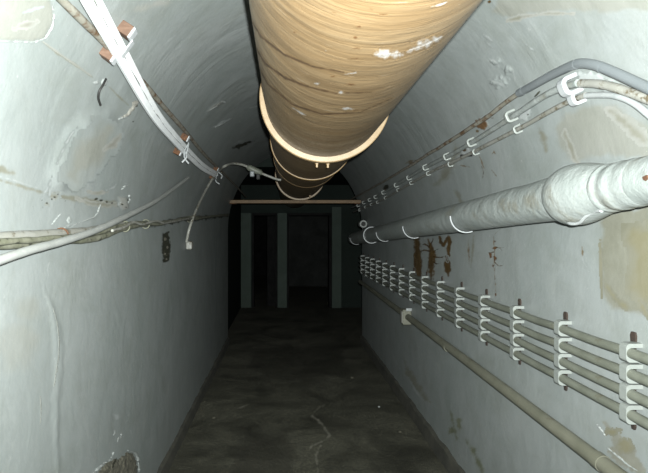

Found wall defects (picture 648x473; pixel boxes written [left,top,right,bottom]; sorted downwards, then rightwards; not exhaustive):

peeling [0,0,57,45]
spalling [162,231,171,262]
rust [412,234,453,283]
damp [596,206,648,321]
spalling [93,450,141,473]